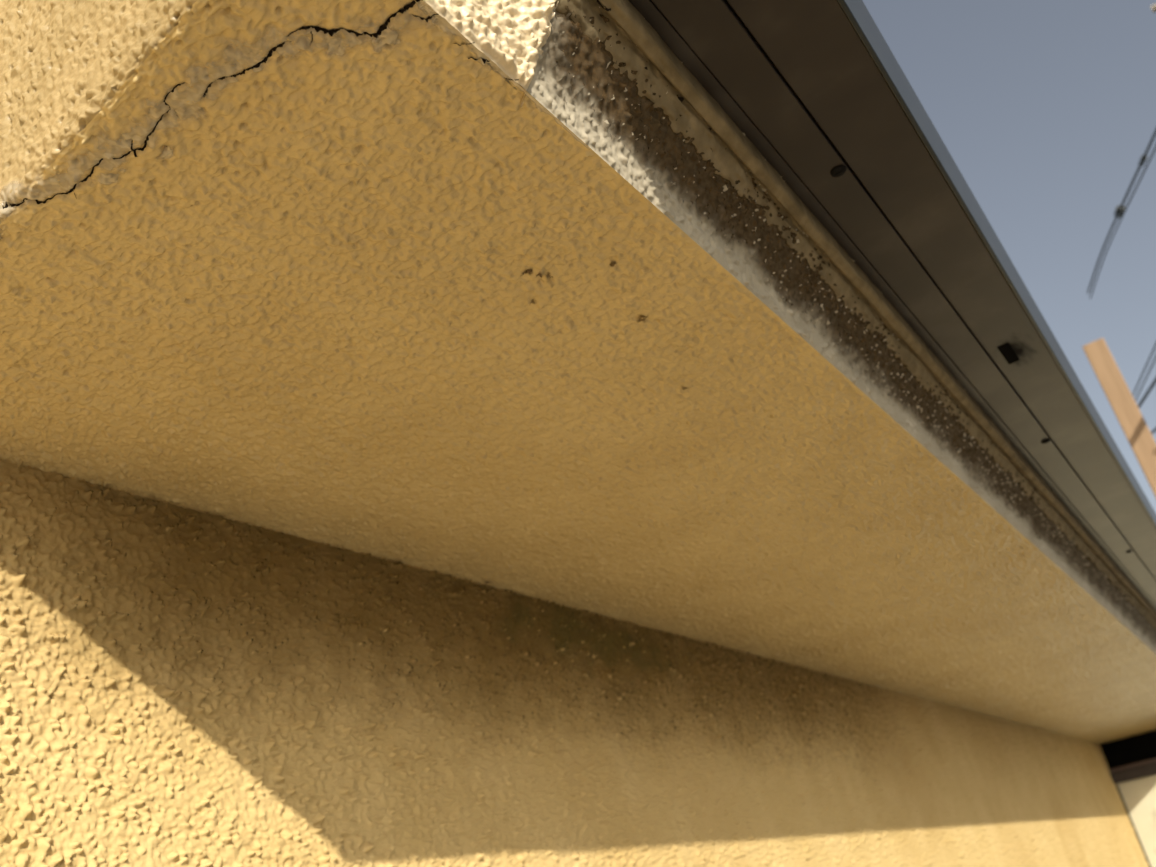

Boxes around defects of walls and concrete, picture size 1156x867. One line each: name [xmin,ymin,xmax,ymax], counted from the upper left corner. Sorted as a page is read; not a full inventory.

crack [3,0,439,209]
crack [453,42,519,81]
water stain [554,11,1156,640]